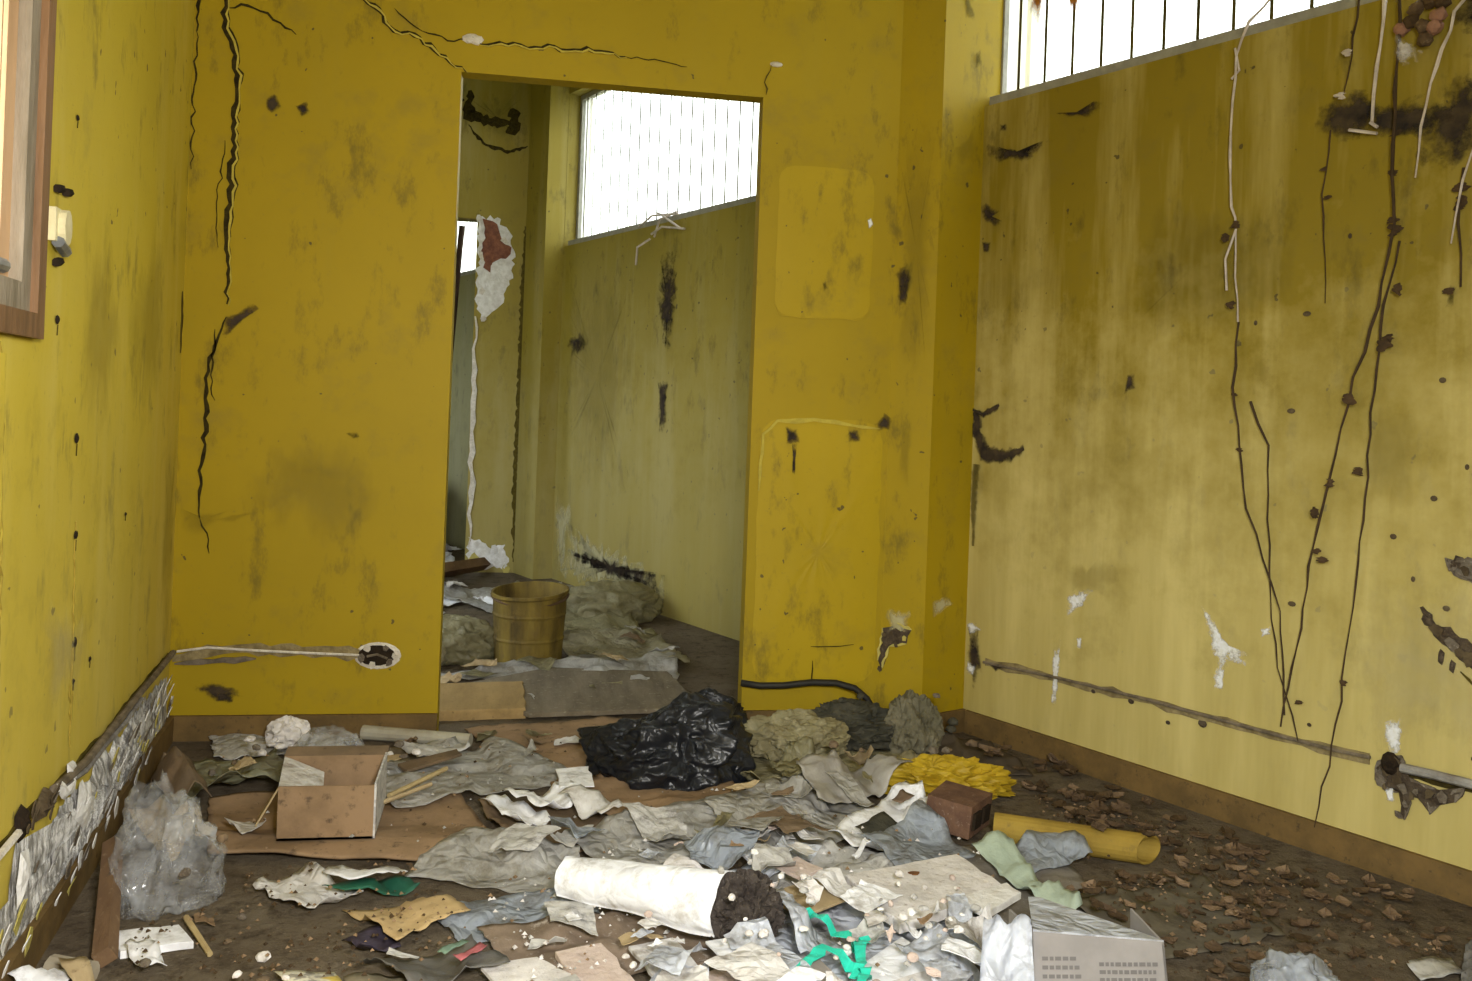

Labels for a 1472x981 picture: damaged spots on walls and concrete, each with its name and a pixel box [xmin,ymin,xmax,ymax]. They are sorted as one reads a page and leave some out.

crack [363,0,686,154]
leakage [1324,79,1472,161]
crack [180,0,296,553]
flaking render [466,215,516,573]
crack [511,226,526,562]
crack [0,423,8,670]
flaking render [1420,606,1472,673]
flaking render [1445,555,1472,583]
flaking render [0,676,175,979]
flaking render [1374,752,1465,820]